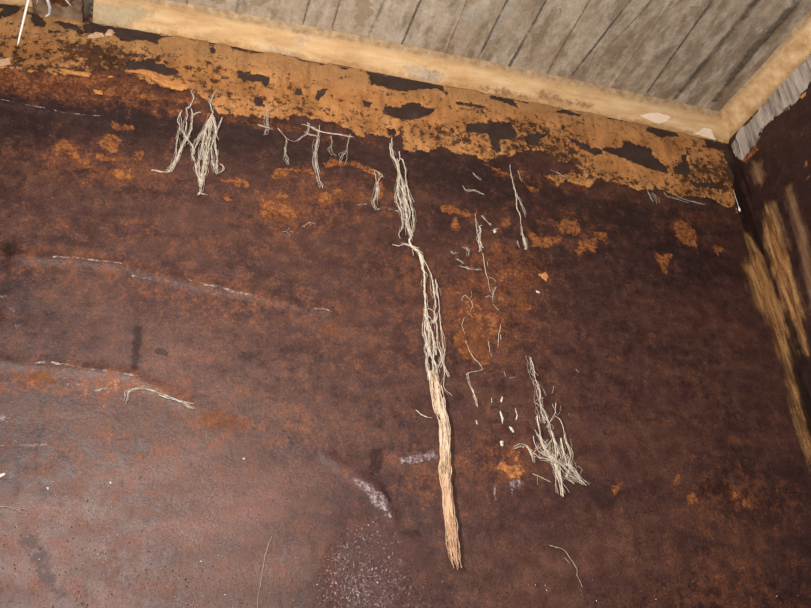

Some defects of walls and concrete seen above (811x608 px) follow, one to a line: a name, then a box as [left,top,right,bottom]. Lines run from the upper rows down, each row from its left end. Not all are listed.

peeling [0,0,811,213]
peeling [257,192,304,224]
damp [732,164,764,255]
corrosion [753,164,764,182]
corrosion [787,187,811,296]
damp [131,325,142,370]
corrosion [745,207,811,460]
damp [787,339,811,447]
damp [401,451,439,465]
damp [0,500,130,608]
damp [270,479,478,608]